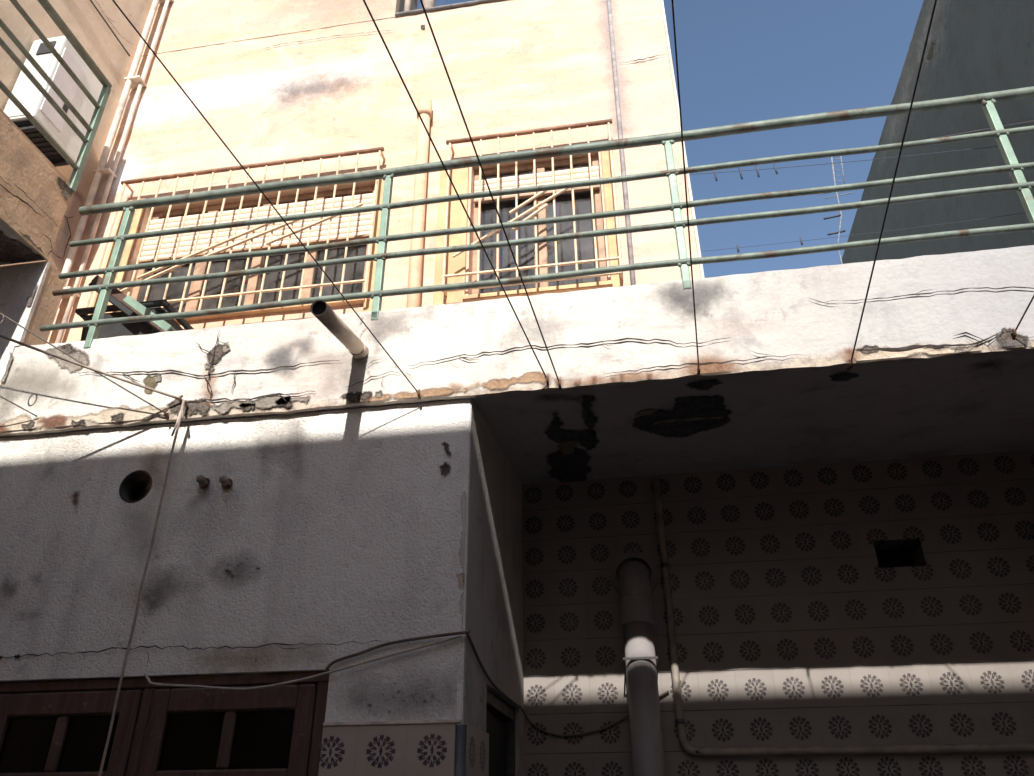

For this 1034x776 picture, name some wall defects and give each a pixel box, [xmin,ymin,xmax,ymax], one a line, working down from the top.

crack [0,176,73,259]
spalling [0,230,44,263]
crack [807,286,1034,304]
spalling [143,375,162,394]
crack [78,330,340,406]
spalling [204,342,230,371]
crack [348,338,789,387]
crack [855,332,999,351]
spalling [166,393,310,416]
spalling [632,379,731,438]
spalling [340,371,600,482]
crack [3,640,389,668]